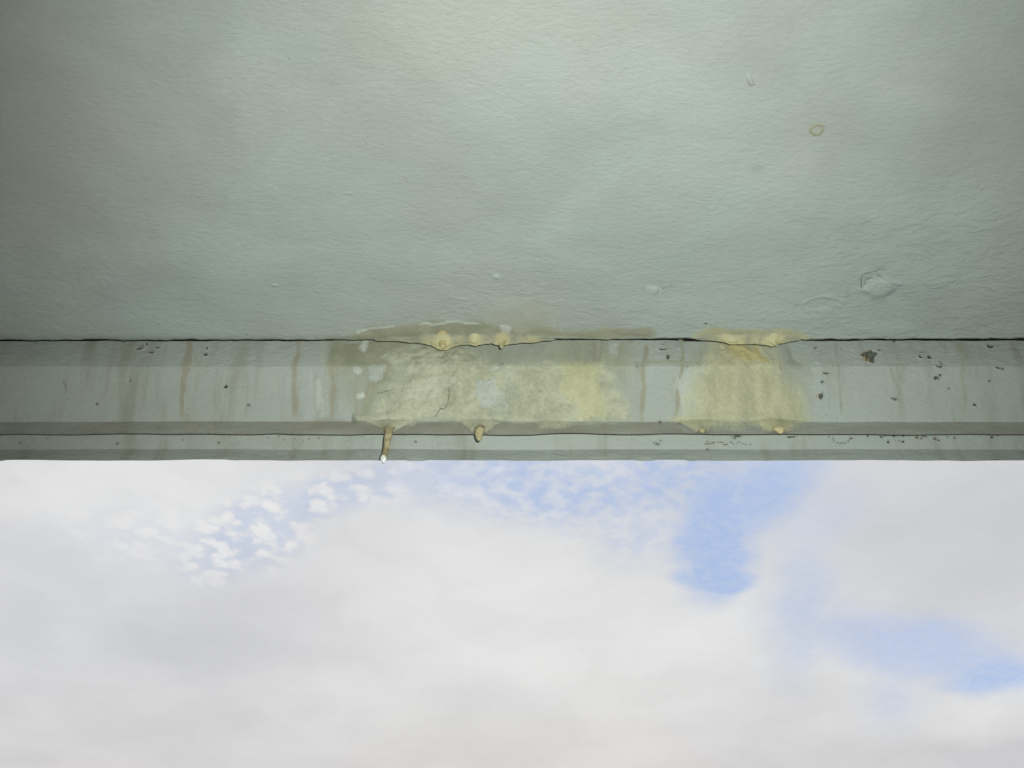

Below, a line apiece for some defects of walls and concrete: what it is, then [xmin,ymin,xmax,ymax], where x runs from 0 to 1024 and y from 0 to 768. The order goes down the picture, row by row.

crack [0,336,112,344]
crack [139,336,375,344]
crack [553,336,708,344]
crack [799,335,1024,343]
peeling [861,348,882,363]
leakage [326,321,812,433]